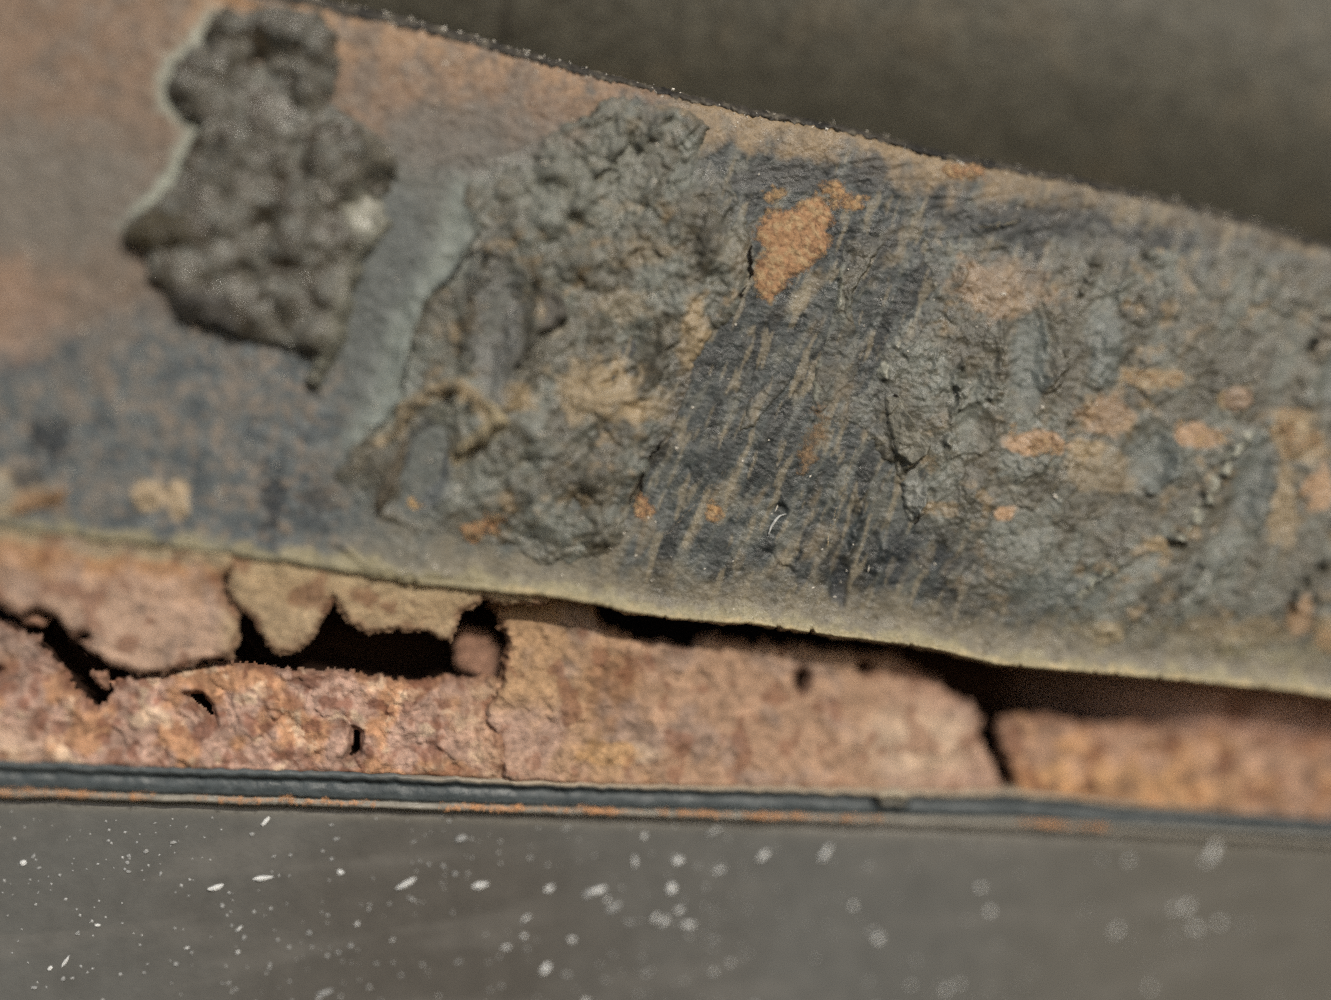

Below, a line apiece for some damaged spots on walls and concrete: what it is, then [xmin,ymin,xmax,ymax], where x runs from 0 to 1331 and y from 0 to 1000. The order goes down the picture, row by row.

rust [753,180,870,303]
peeling [811,221,1331,671]
rust [0,519,1331,818]
rust [665,810,861,820]